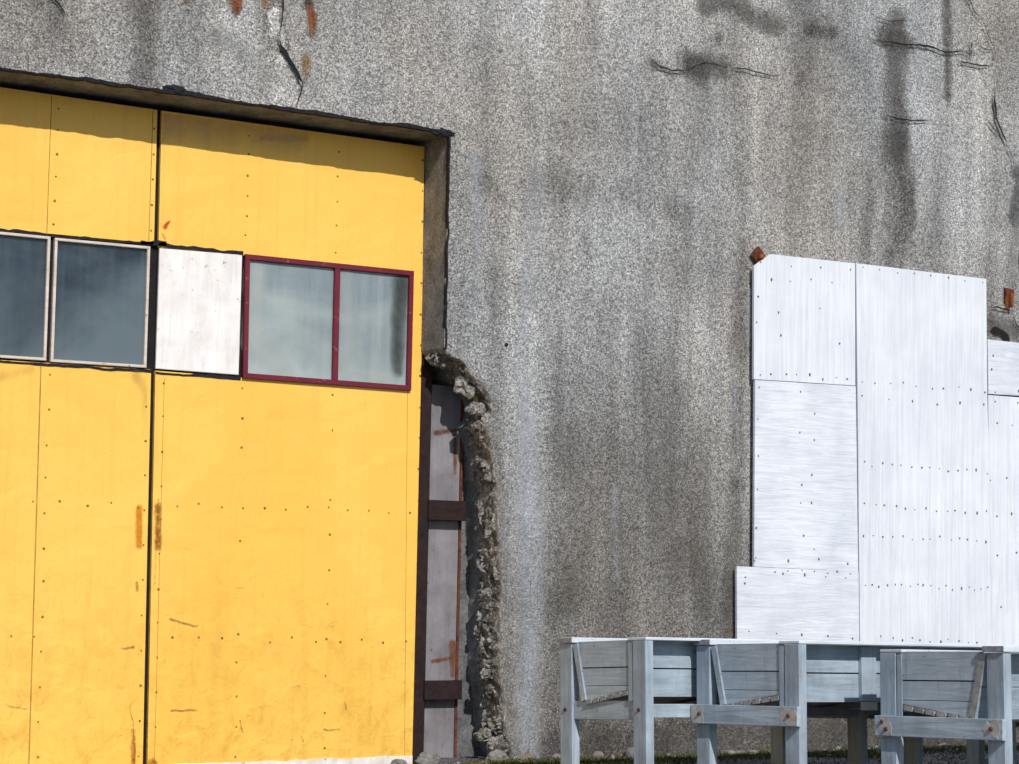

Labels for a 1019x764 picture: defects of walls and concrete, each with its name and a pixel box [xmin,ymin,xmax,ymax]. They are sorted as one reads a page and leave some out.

crack [279,0,304,101]
corrosion [305,0,317,36]
crack [655,62,775,76]
crack [877,0,995,66]
damp [878,10,920,252]
crack [885,97,927,122]
crack [988,91,1015,167]
spalling [424,350,518,760]